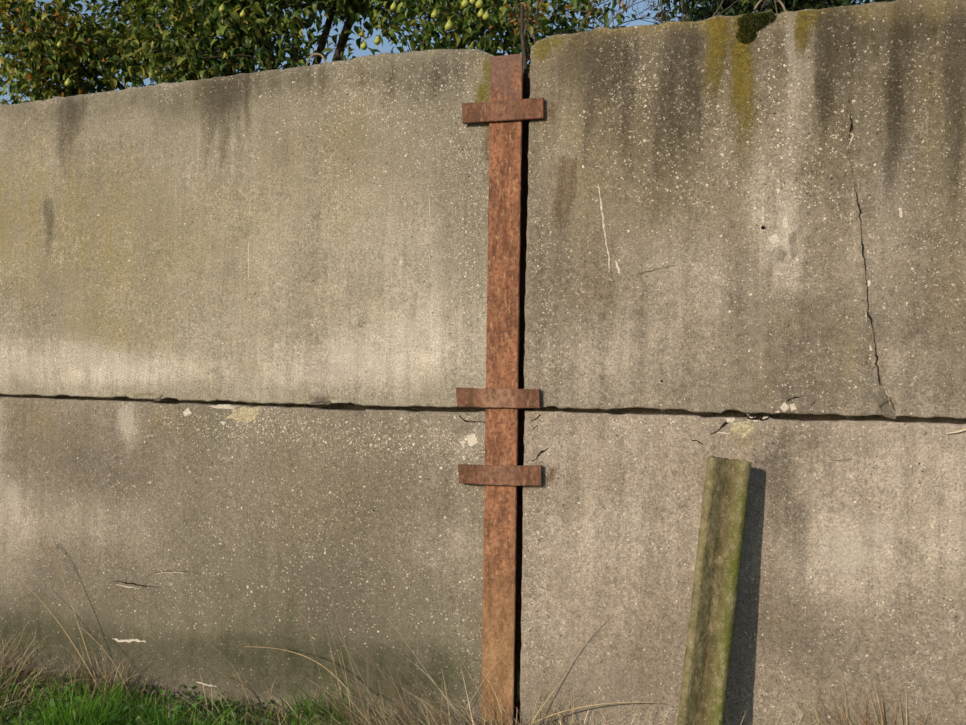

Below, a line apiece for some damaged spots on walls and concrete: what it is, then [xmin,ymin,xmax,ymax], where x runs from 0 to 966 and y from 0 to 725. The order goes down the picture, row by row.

leakage [705,16,754,134]
crack [847,100,896,419]